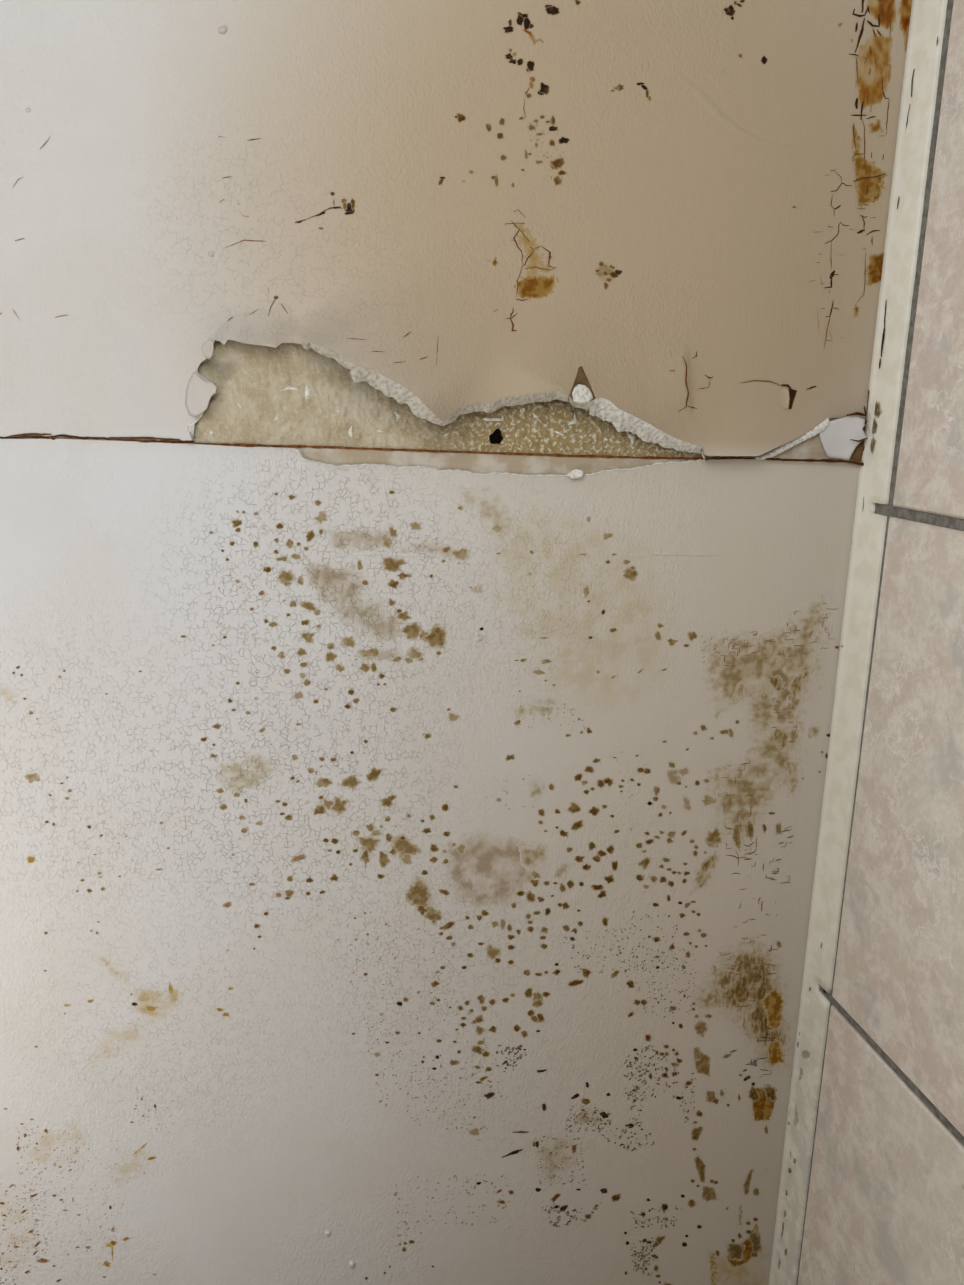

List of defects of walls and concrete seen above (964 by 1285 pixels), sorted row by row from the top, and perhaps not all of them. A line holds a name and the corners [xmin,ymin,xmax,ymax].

damp [545,4,560,15]
damp [724,0,745,20]
damp [485,12,570,187]
damp [611,82,651,101]
damp [593,261,622,290]
crack [878,302,886,368]
peeling [193,340,882,475]
damp [200,482,839,1285]
damp [81,951,185,1076]